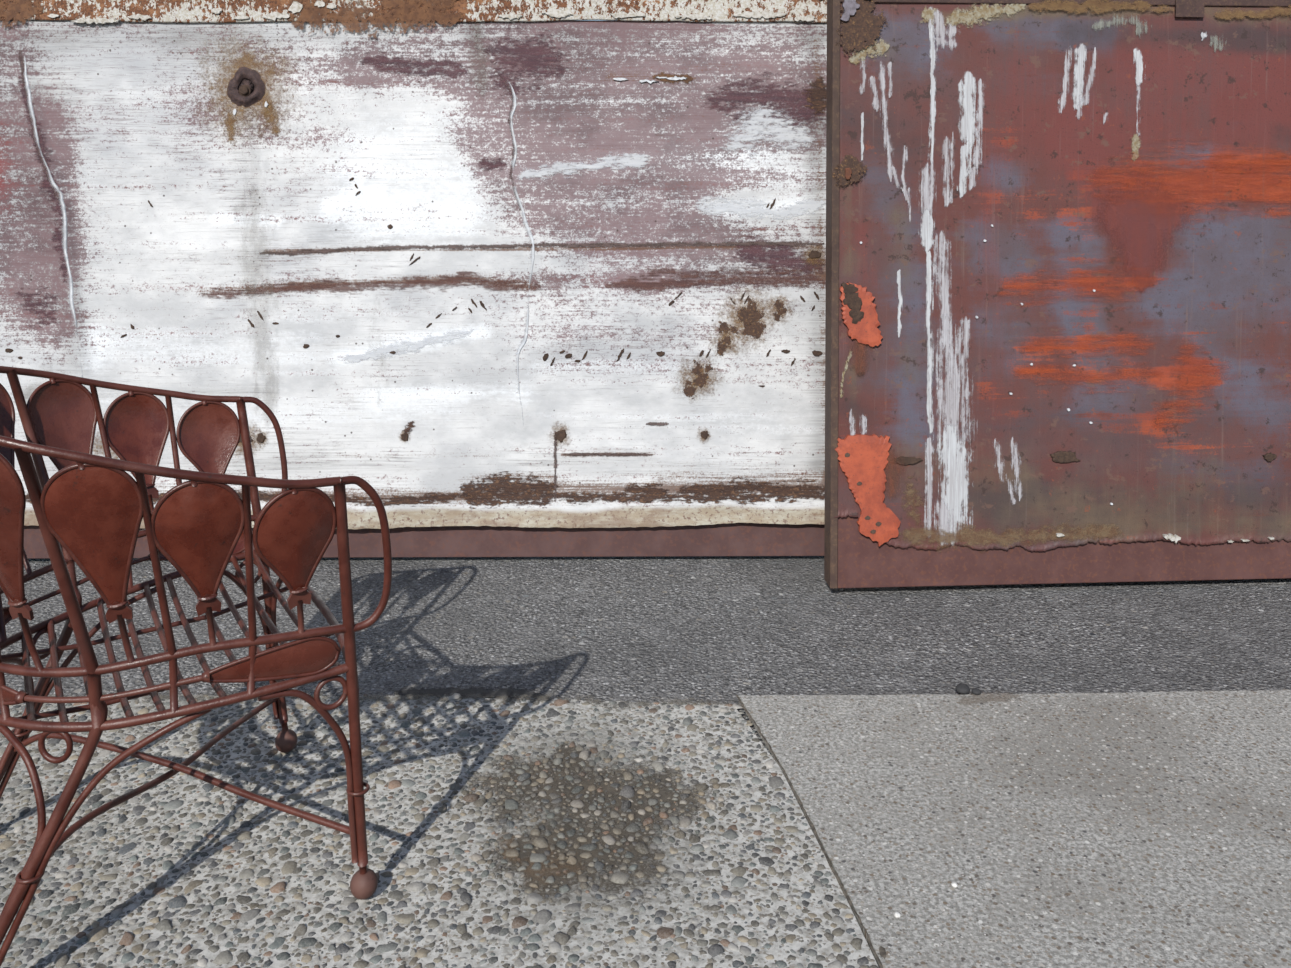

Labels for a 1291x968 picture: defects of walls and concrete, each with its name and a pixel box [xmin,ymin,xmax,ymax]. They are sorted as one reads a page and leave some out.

rust [0,0,44,28]
rust [285,0,463,38]
peeling [920,3,1026,49]
rust [208,44,289,141]
peeling [733,236,825,276]
rust [605,248,825,399]
peeling [839,282,883,374]
peeling [835,434,923,546]
water stain [468,744,712,903]